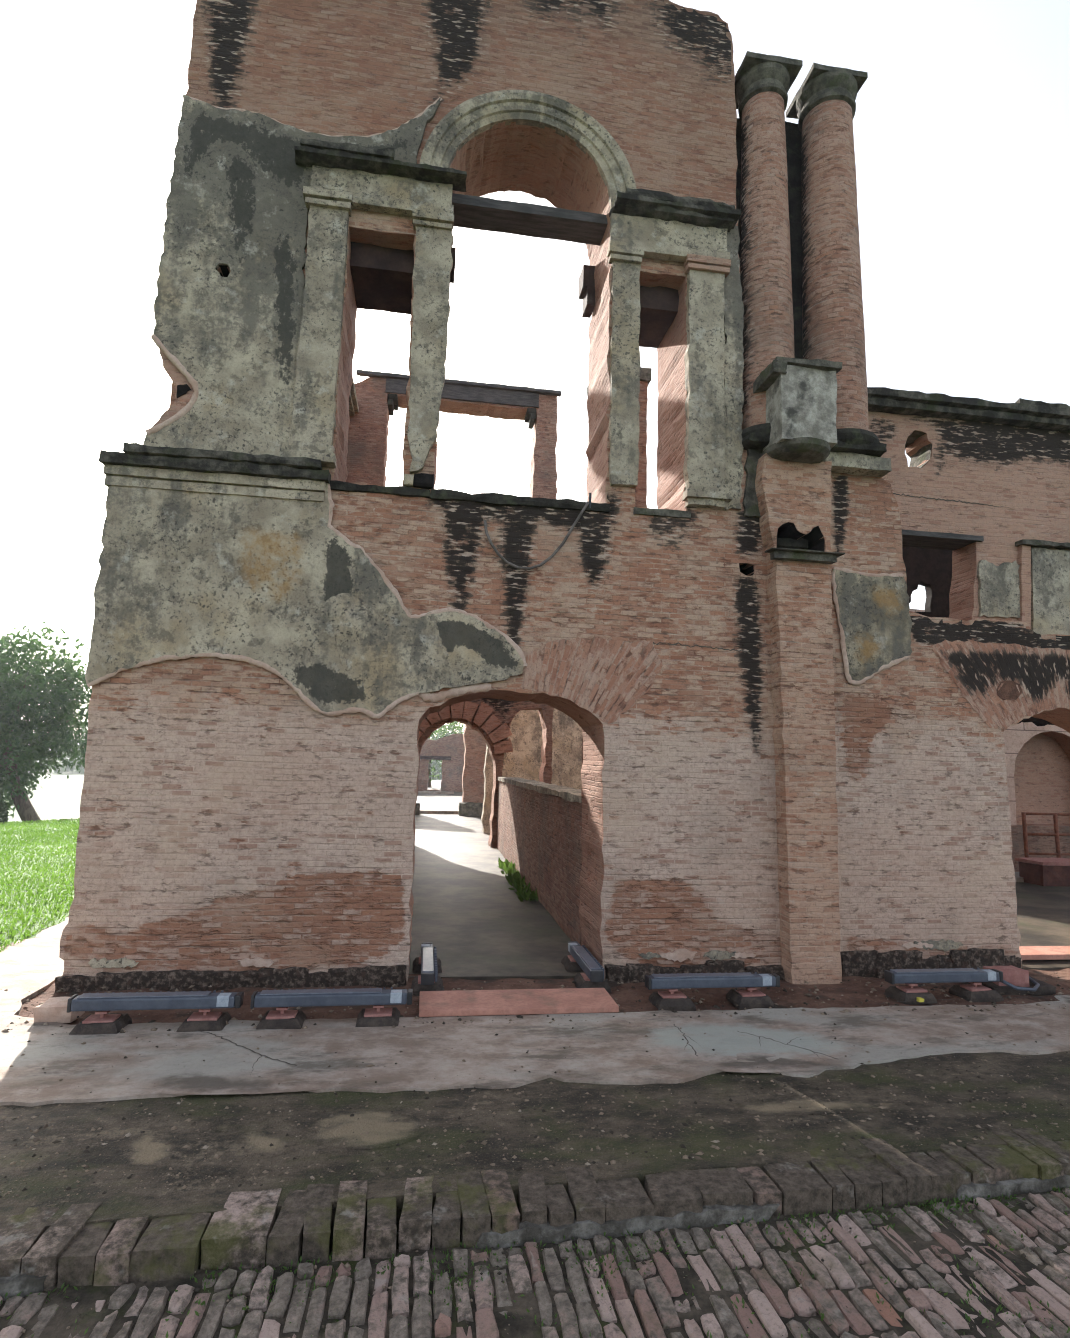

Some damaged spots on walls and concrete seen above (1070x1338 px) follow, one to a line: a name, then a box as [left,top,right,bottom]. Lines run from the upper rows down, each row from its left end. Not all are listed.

damp [196,0,265,109]
damp [417,0,734,112]
peeling [143,94,442,457]
peeling [721,225,762,518]
damp [868,415,1070,483]
peeling [85,473,527,719]
damp [417,470,711,651]
damp [729,504,768,762]
spalling [777,522,825,552]
damp [830,473,852,561]
peeling [831,567,912,685]
damp [910,616,1070,709]